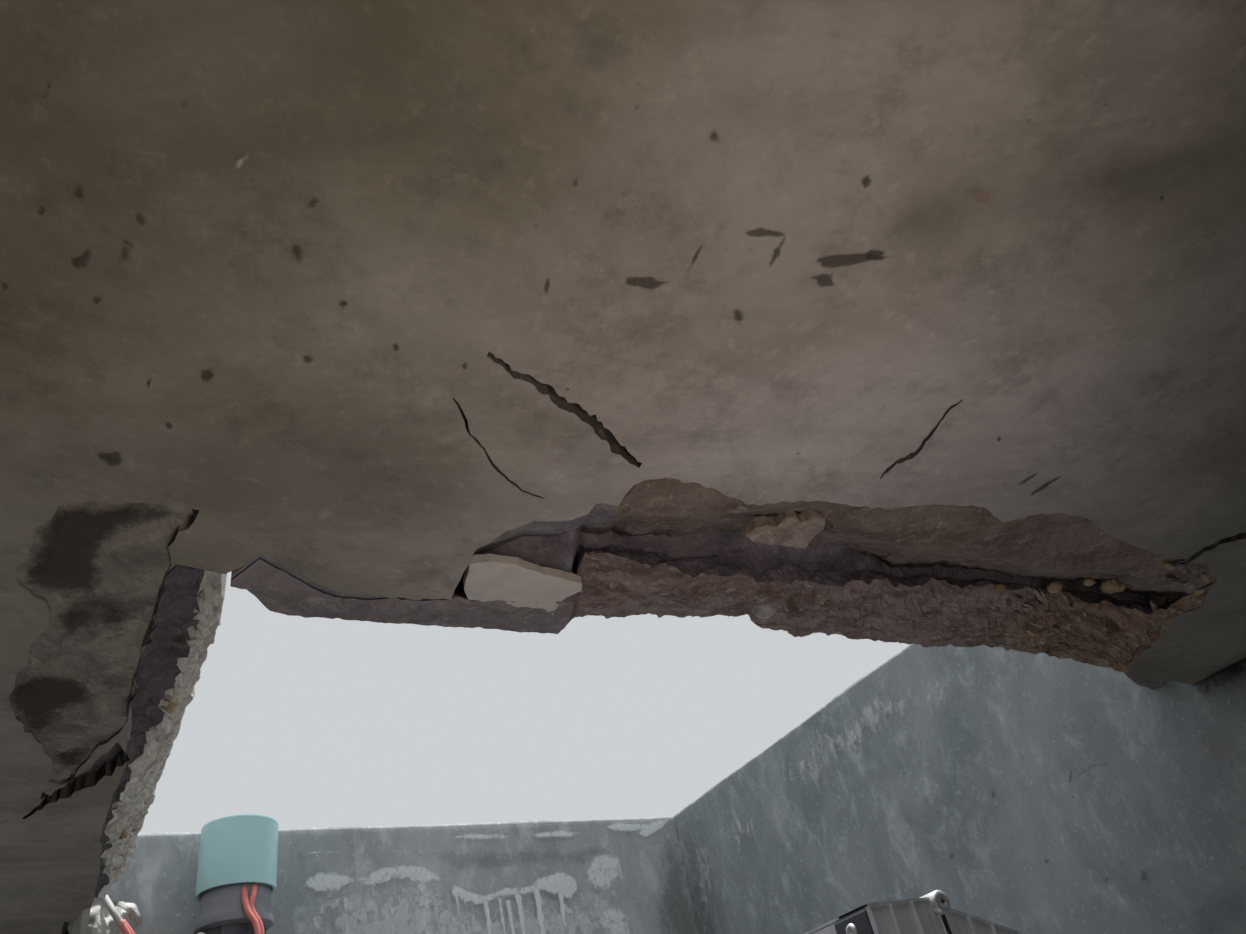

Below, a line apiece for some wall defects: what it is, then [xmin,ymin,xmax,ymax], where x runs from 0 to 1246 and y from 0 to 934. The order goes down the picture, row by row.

crack [452,398,544,499]
crack [487,352,642,468]
crack [880,400,962,479]
crack [1169,532,1246,567]
spalling [9,478,1215,899]
crack [22,729,133,820]
damp [307,855,630,934]